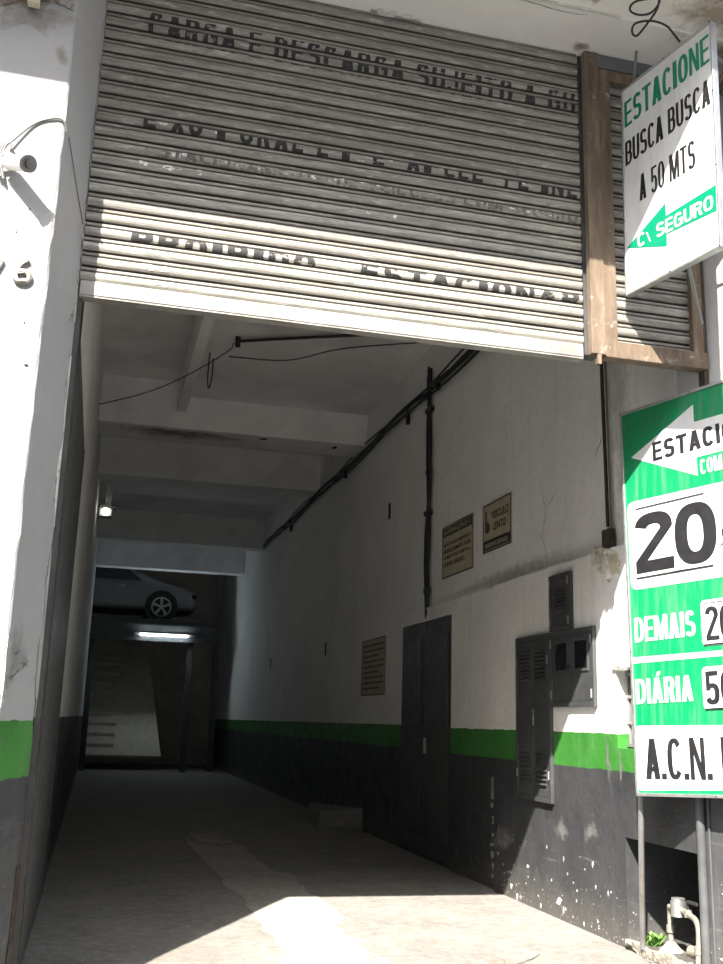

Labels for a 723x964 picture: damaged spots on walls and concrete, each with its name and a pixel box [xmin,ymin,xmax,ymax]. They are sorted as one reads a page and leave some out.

flaking render [591,546,621,583]
spalling [622,938,694,964]